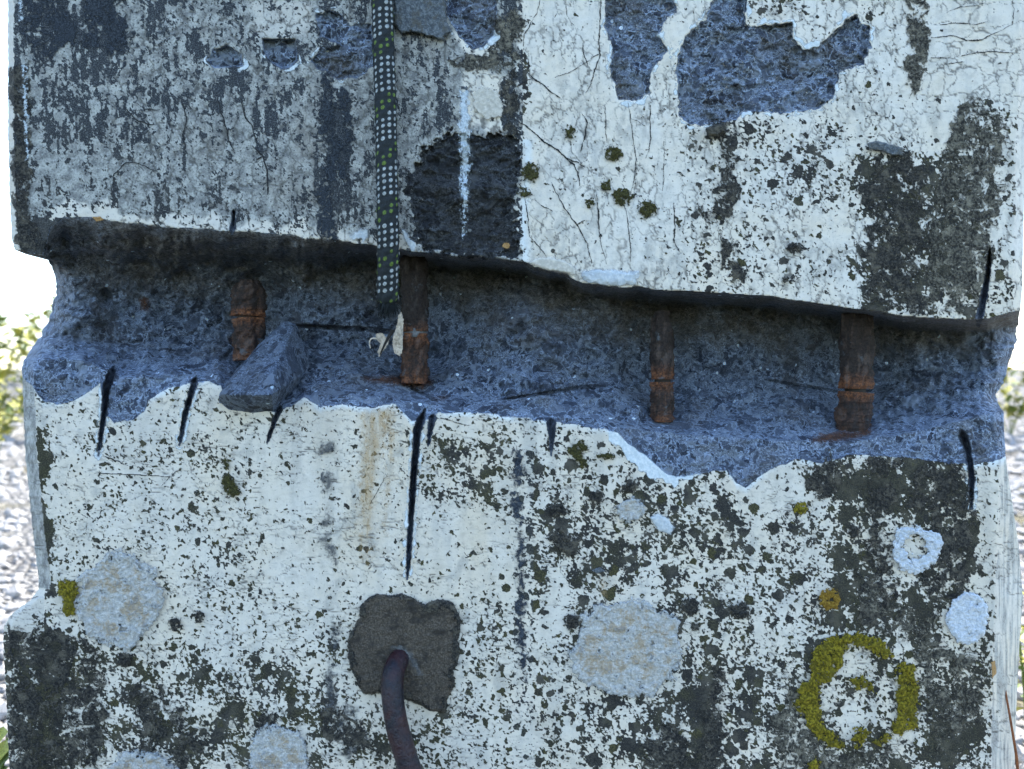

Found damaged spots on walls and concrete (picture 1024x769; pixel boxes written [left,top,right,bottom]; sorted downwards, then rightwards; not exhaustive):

spalling [601,0,875,130]
spalling [402,85,526,261]
peeling [350,229,368,247]
spalling [22,359,151,422]
spalling [609,411,1002,488]